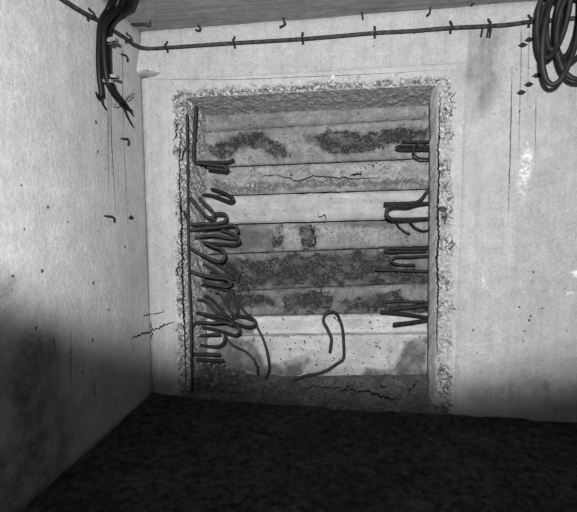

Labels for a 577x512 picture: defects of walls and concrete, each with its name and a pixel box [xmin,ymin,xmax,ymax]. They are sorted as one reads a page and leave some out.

crack [131,118,187,389]
spalling [168,64,466,414]
crack [261,173,377,181]
crack [300,383,416,400]